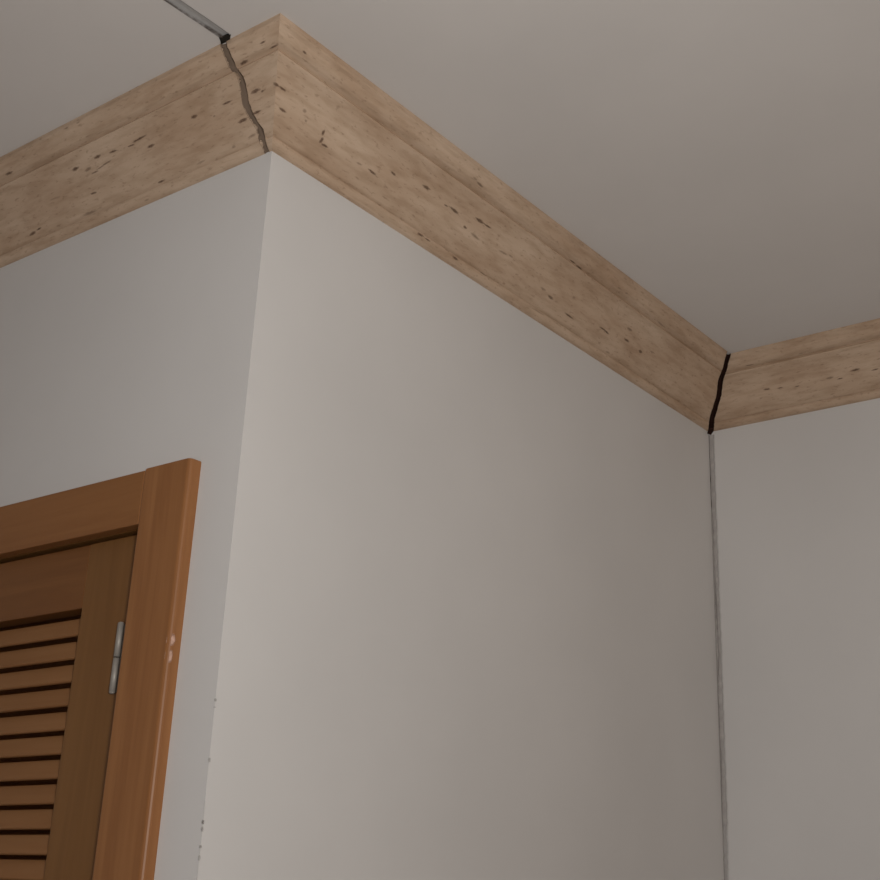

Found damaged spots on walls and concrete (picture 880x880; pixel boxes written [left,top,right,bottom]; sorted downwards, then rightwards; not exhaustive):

crack [164,0,269,154]
crack [707,354,731,877]